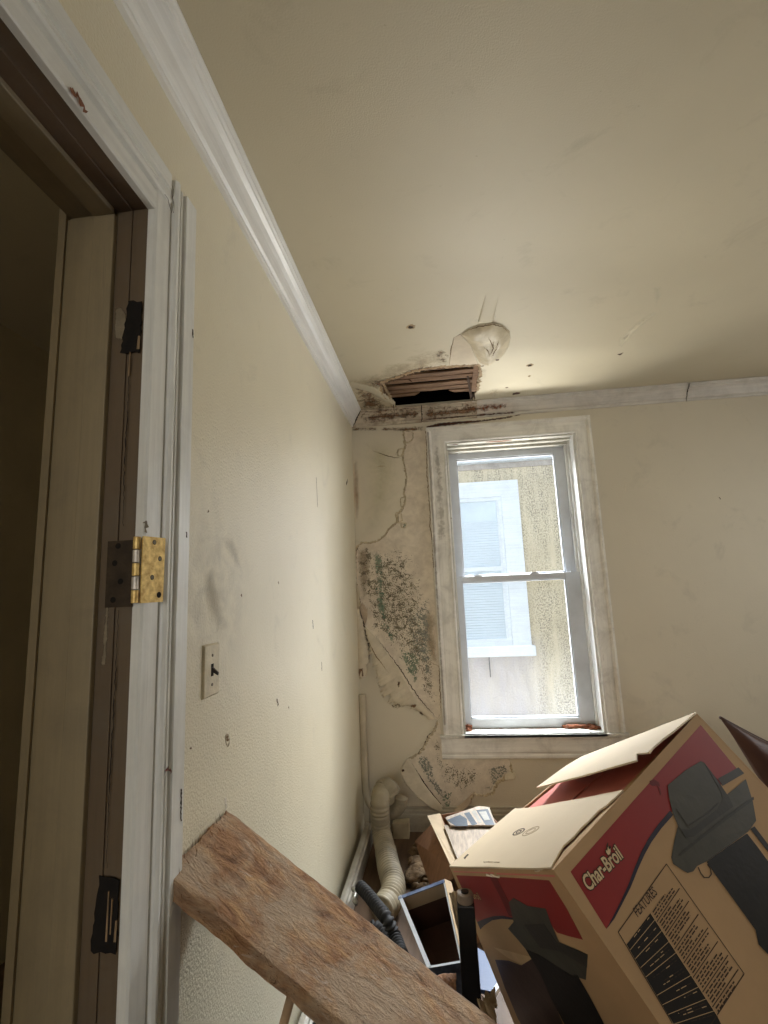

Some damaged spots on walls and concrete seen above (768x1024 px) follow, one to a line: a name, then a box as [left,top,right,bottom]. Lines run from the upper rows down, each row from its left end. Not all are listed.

water stain [353,352,478,431]
water stain [358,548,435,702]
peeling [356,430,513,812]